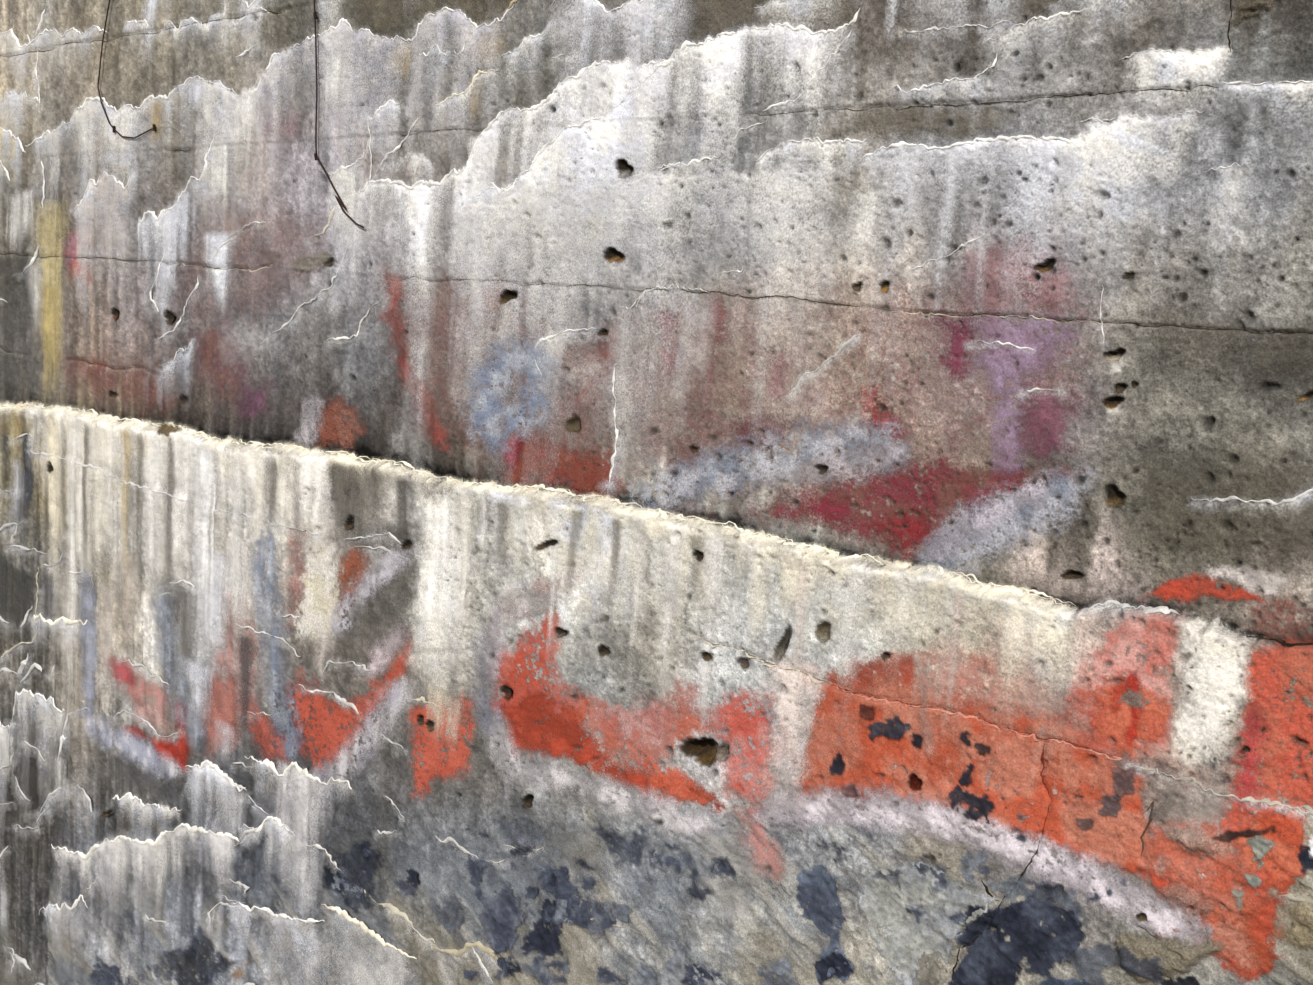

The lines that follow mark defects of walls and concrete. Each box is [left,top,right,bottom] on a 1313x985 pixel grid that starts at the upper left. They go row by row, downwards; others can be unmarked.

crack [4,9,290,57]
crack [1225,0,1233,52]
water stain [1120,46,1313,101]
crack [748,85,1218,115]
water stain [0,0,1205,392]
water stain [1208,162,1251,210]
crack [0,253,273,272]
crack [403,276,1313,334]
water stain [0,247,1313,985]
spalling [680,737,729,766]
peeling [1298,836,1313,873]